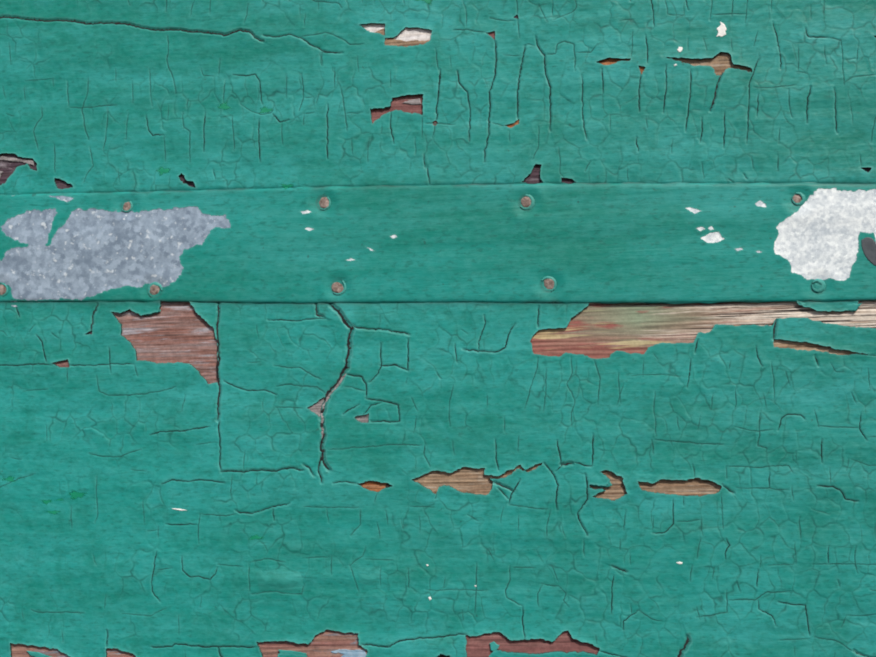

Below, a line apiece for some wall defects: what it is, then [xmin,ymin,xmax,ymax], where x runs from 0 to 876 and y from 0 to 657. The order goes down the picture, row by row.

crack [0,0,360,181]
crack [415,0,604,183]
crack [710,0,875,168]
peeling [0,178,231,307]
peeling [774,187,876,281]
peeling [111,301,219,384]
peeling [530,300,876,359]
crack [92,303,437,591]
crack [494,419,594,552]
peeling [256,629,368,657]
crack [361,550,568,648]
peeling [465,630,600,657]